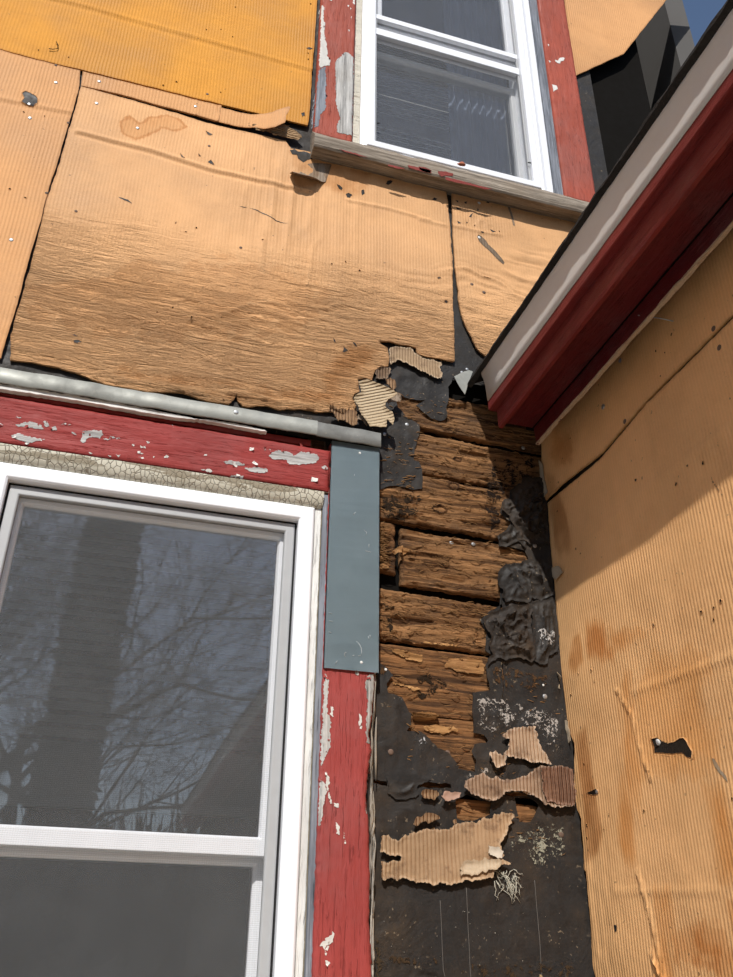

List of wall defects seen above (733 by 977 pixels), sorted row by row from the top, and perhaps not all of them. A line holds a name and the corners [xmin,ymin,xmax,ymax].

peeling [311,0,354,136]
peeling [12,414,120,454]
peeling [225,443,328,482]
peeling [320,674,331,765]
peeling [354,670,377,791]
peeling [318,779,327,826]
peeling [320,932,334,967]